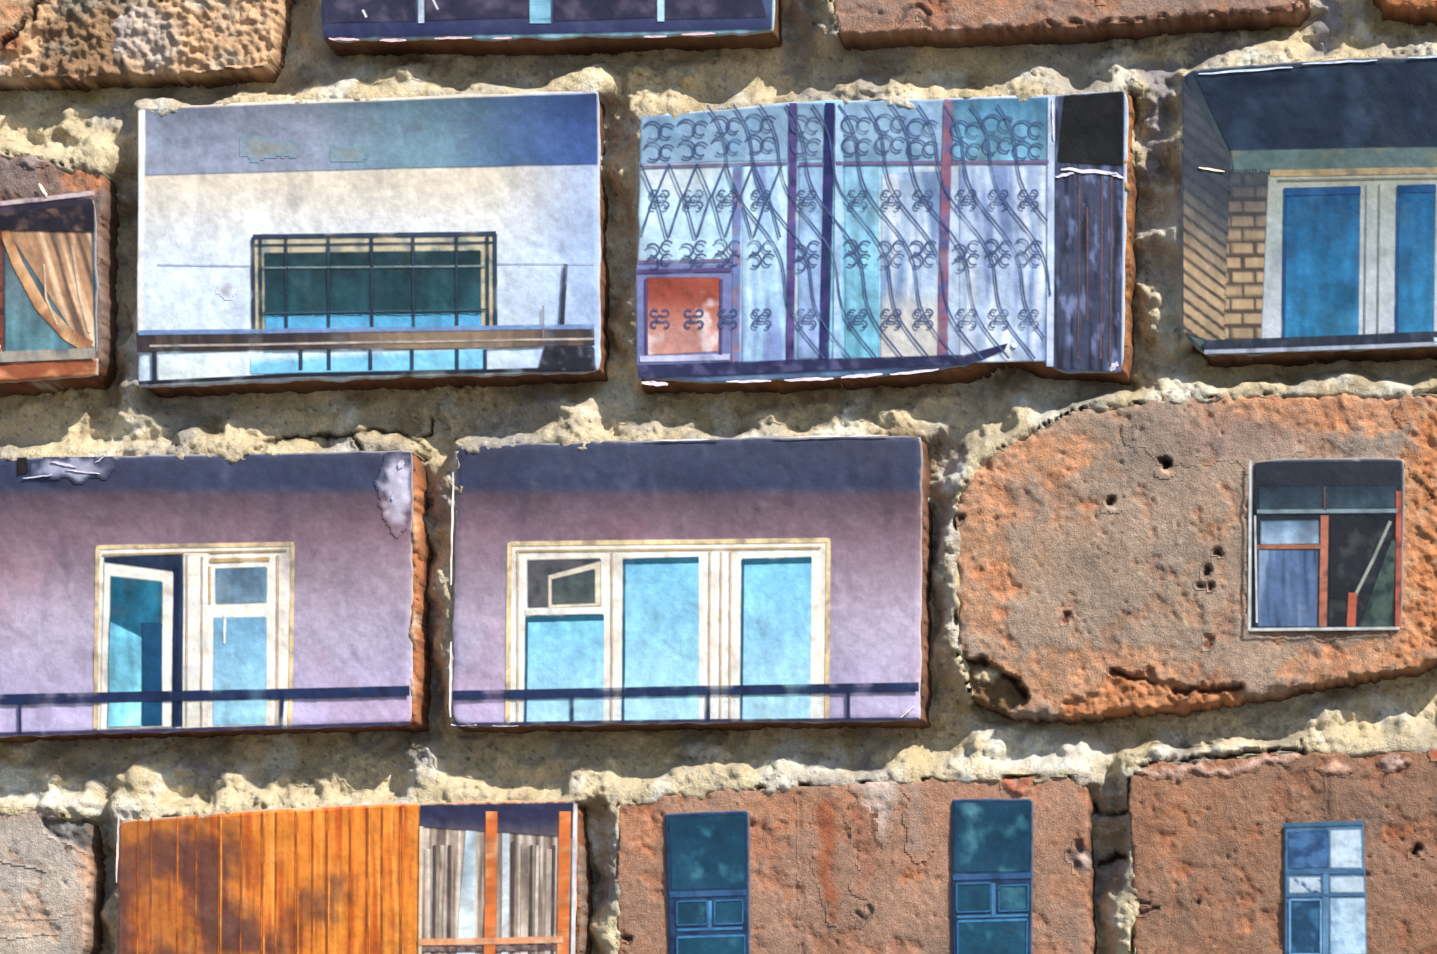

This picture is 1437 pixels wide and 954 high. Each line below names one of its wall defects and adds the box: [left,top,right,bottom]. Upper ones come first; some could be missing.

spalling [4,0,158,93]
spalling [163,0,295,89]
spalling [963,651,1031,719]
spalling [1058,665,1245,724]